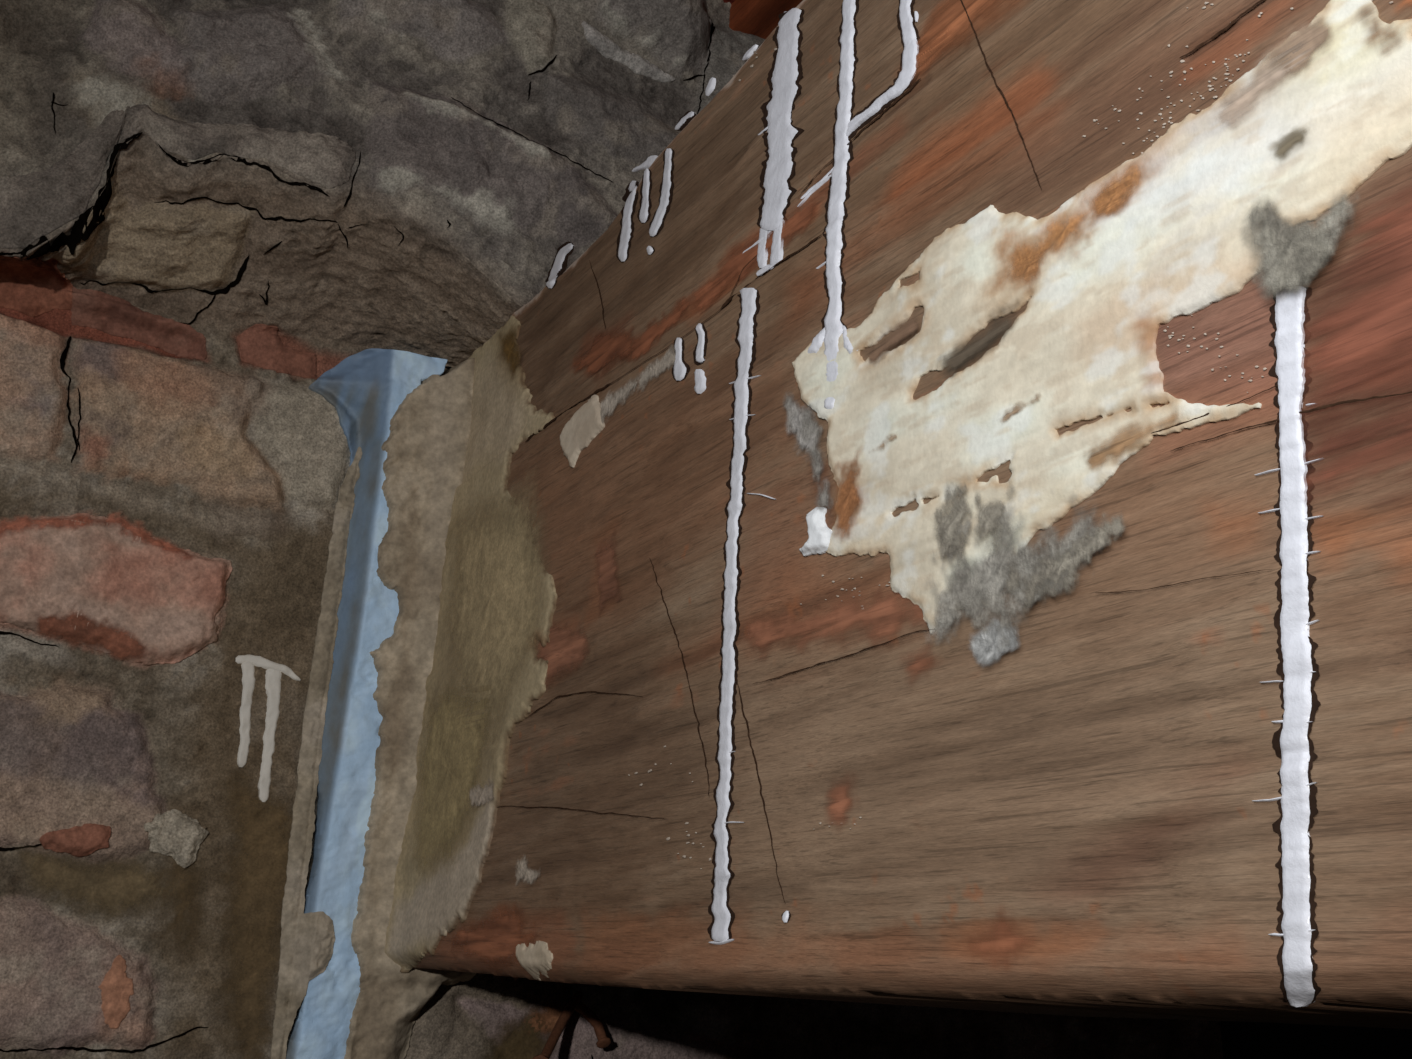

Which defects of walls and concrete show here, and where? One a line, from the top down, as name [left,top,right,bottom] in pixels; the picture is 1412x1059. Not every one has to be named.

damp [742,44,758,61]
crack [1180,0,1263,58]
damp [632,155,658,172]
crack [0,132,404,325]
damp [756,218,785,276]
damp [1011,165,1142,282]
corrosion [574,203,813,375]
damp [834,462,861,535]
damp [235,655,301,681]
flaking render [516,941,553,981]
crack [0,1026,208,1053]